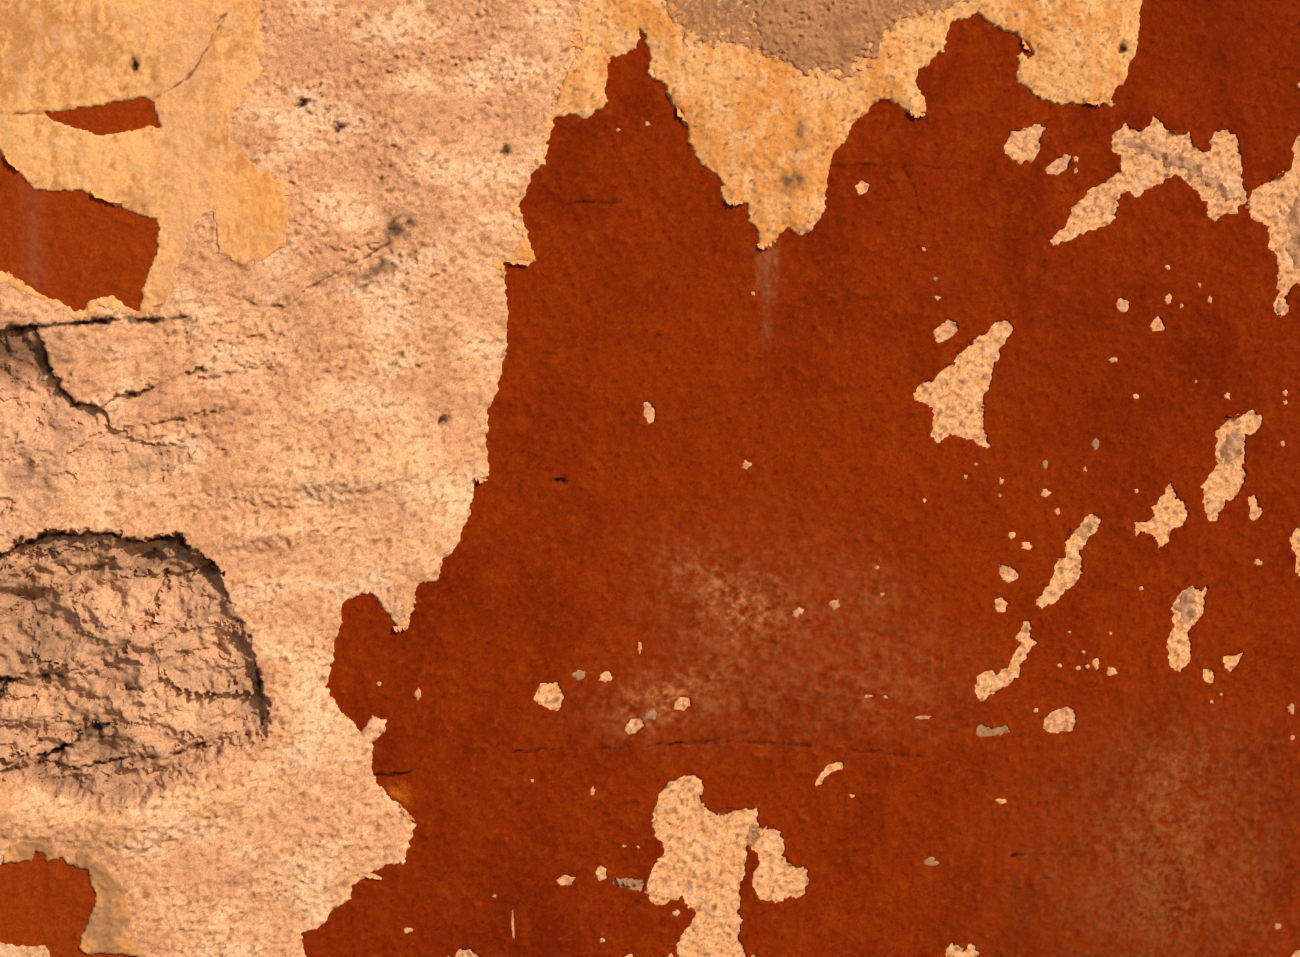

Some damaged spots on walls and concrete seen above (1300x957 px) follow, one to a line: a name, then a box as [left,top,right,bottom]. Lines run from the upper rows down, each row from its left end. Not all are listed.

peeling [542,0,1142,250]
peeling [1050,116,1300,318]
crack [14,317,160,410]
peeling [913,320,1013,448]
flaking render [0,0,587,957]
peeling [1036,514,1101,608]
peeling [1135,483,1188,548]
peeling [1200,410,1263,521]
peeling [975,621,1037,701]
peeling [1166,586,1243,683]
peeling [1043,707,1076,733]
peeling [596,775,809,957]